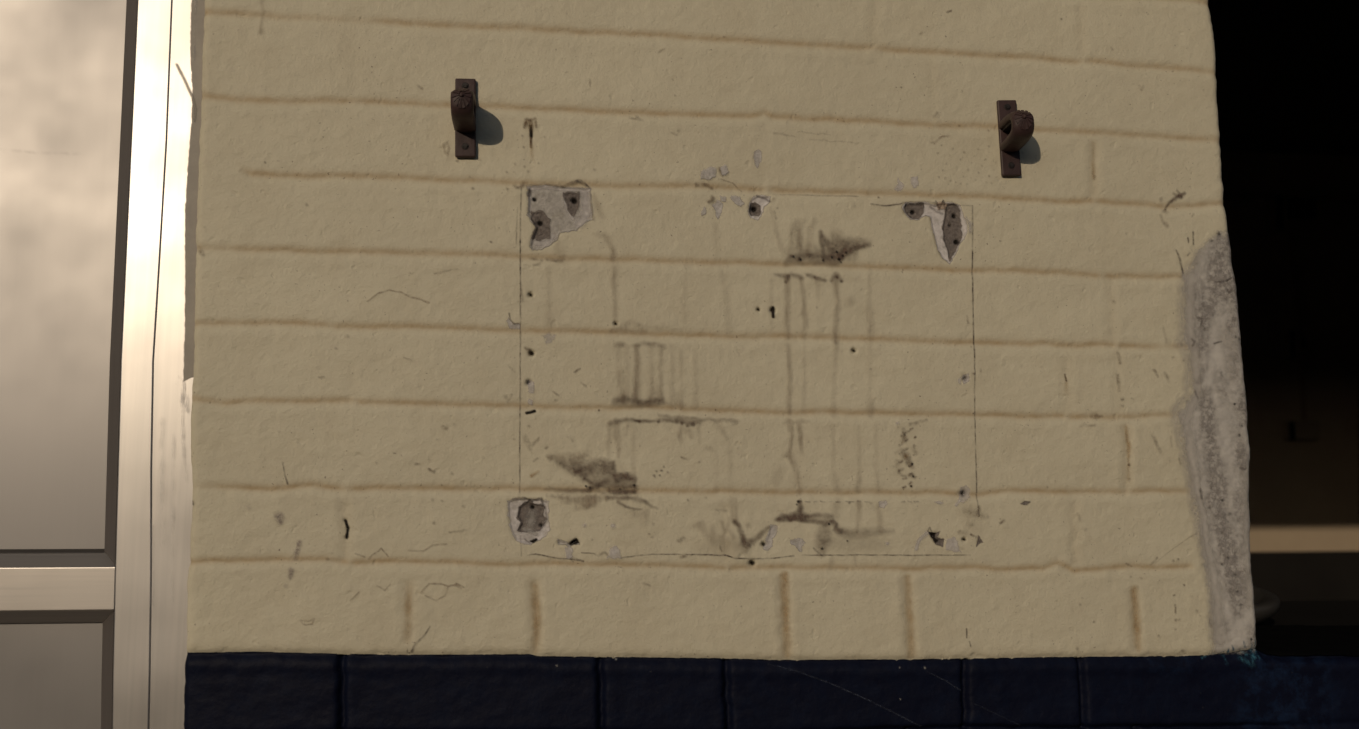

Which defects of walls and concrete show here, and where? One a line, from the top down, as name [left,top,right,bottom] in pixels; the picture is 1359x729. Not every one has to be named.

peeling [527,180,592,250]
peeling [902,200,971,264]
peeling [507,498,579,558]